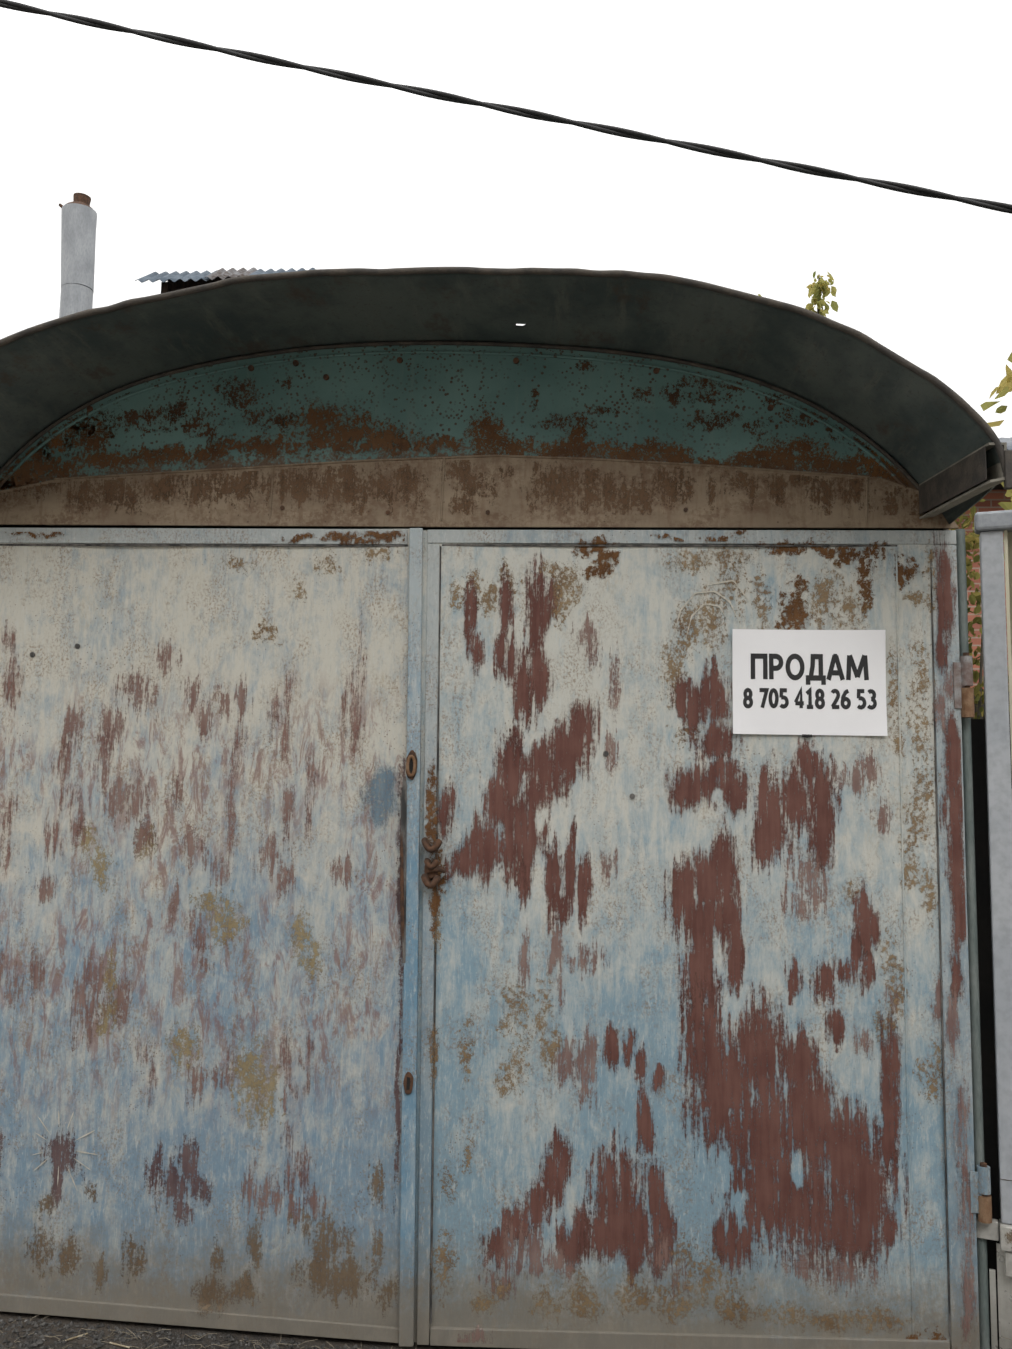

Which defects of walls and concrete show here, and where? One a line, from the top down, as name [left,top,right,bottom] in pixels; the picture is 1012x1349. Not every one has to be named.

rust [0,398,929,516]
rust [450,558,523,618]
rust [539,534,621,631]
rust [871,927,911,1042]
rust [367,1160,385,1209]
rust [24,1191,148,1295]
rust [191,1214,263,1318]
rust [283,1206,400,1319]